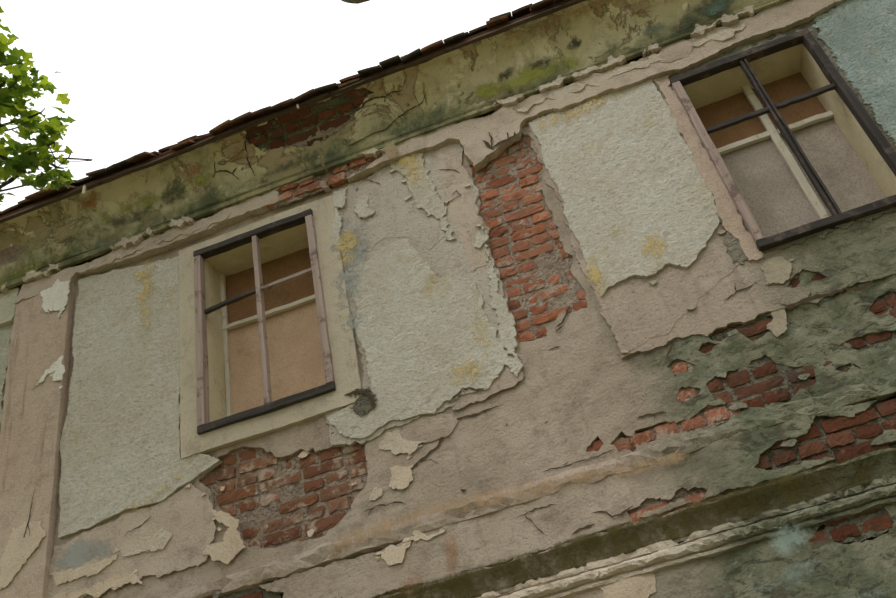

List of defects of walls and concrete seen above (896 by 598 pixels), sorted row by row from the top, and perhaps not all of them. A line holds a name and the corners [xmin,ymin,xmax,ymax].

spalling [246,87,402,150]
crack [359,90,426,122]
spalling [427,135,587,342]
peeling [40,279,71,319]
peeling [600,229,740,355]
spalling [699,308,788,354]
spalling [839,293,896,351]
peeling [32,355,65,389]
spalling [586,356,851,452]
spalling [755,399,896,479]
spalling [47,429,427,598]
spalling [807,508,894,544]